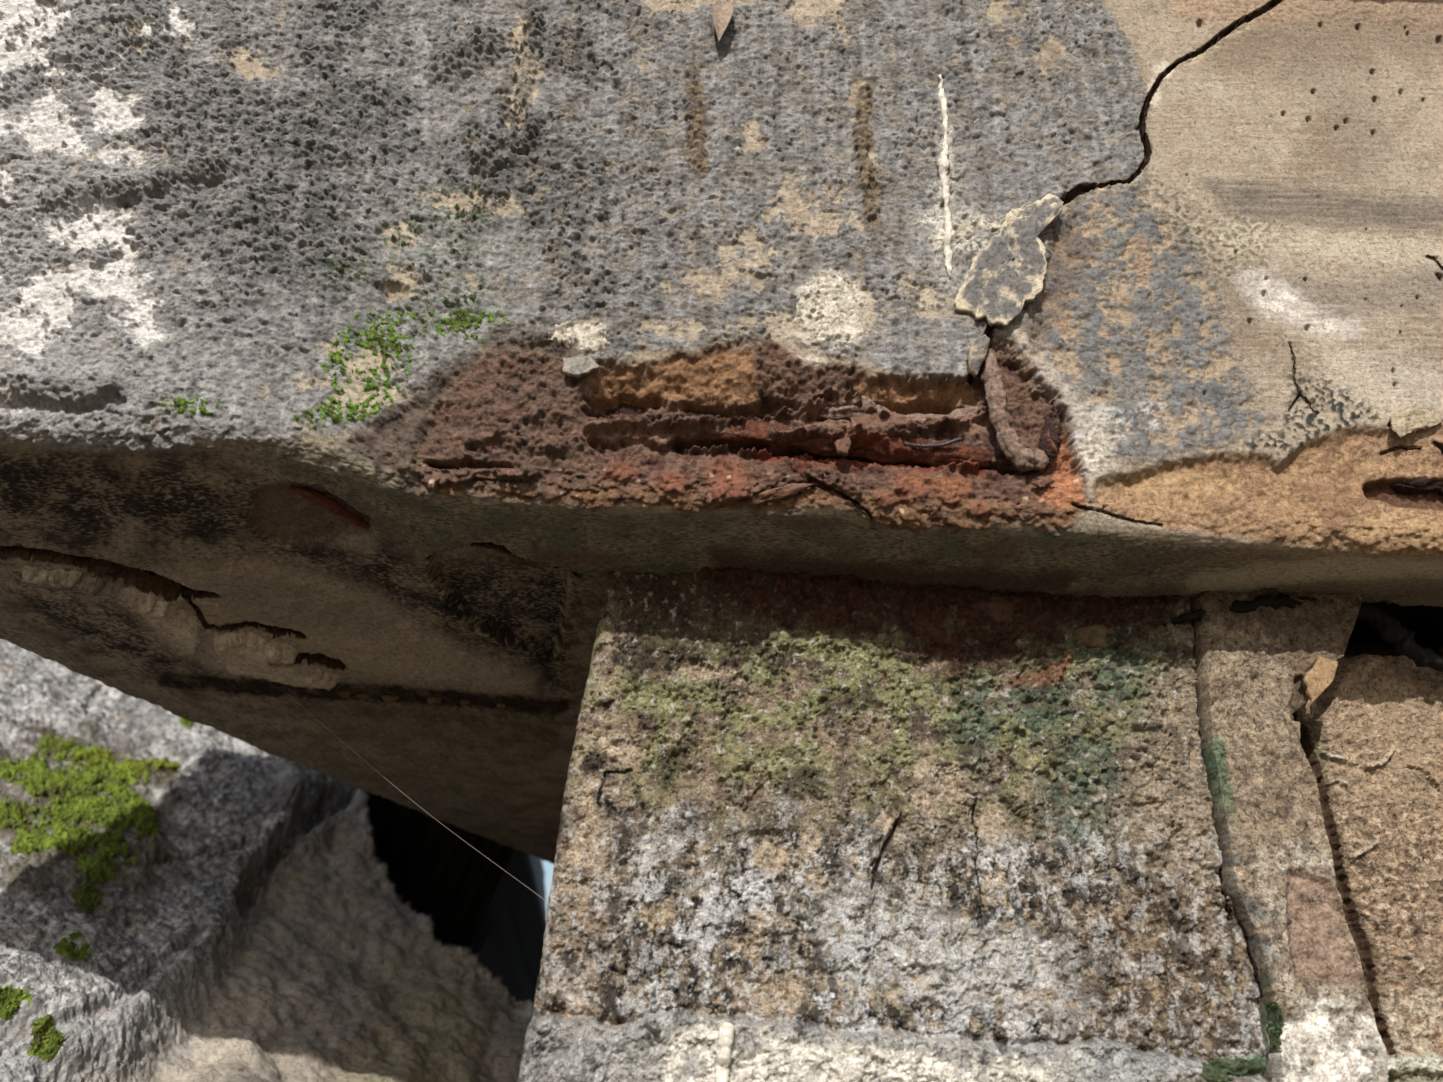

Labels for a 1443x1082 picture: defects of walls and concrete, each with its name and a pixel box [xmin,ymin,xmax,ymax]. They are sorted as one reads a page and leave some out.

crack [1061,0,1282,205]
spalling [413,193,1443,557]
crack [968,325,994,383]
crack [1191,622,1290,1006]
crack [1292,713,1396,1053]